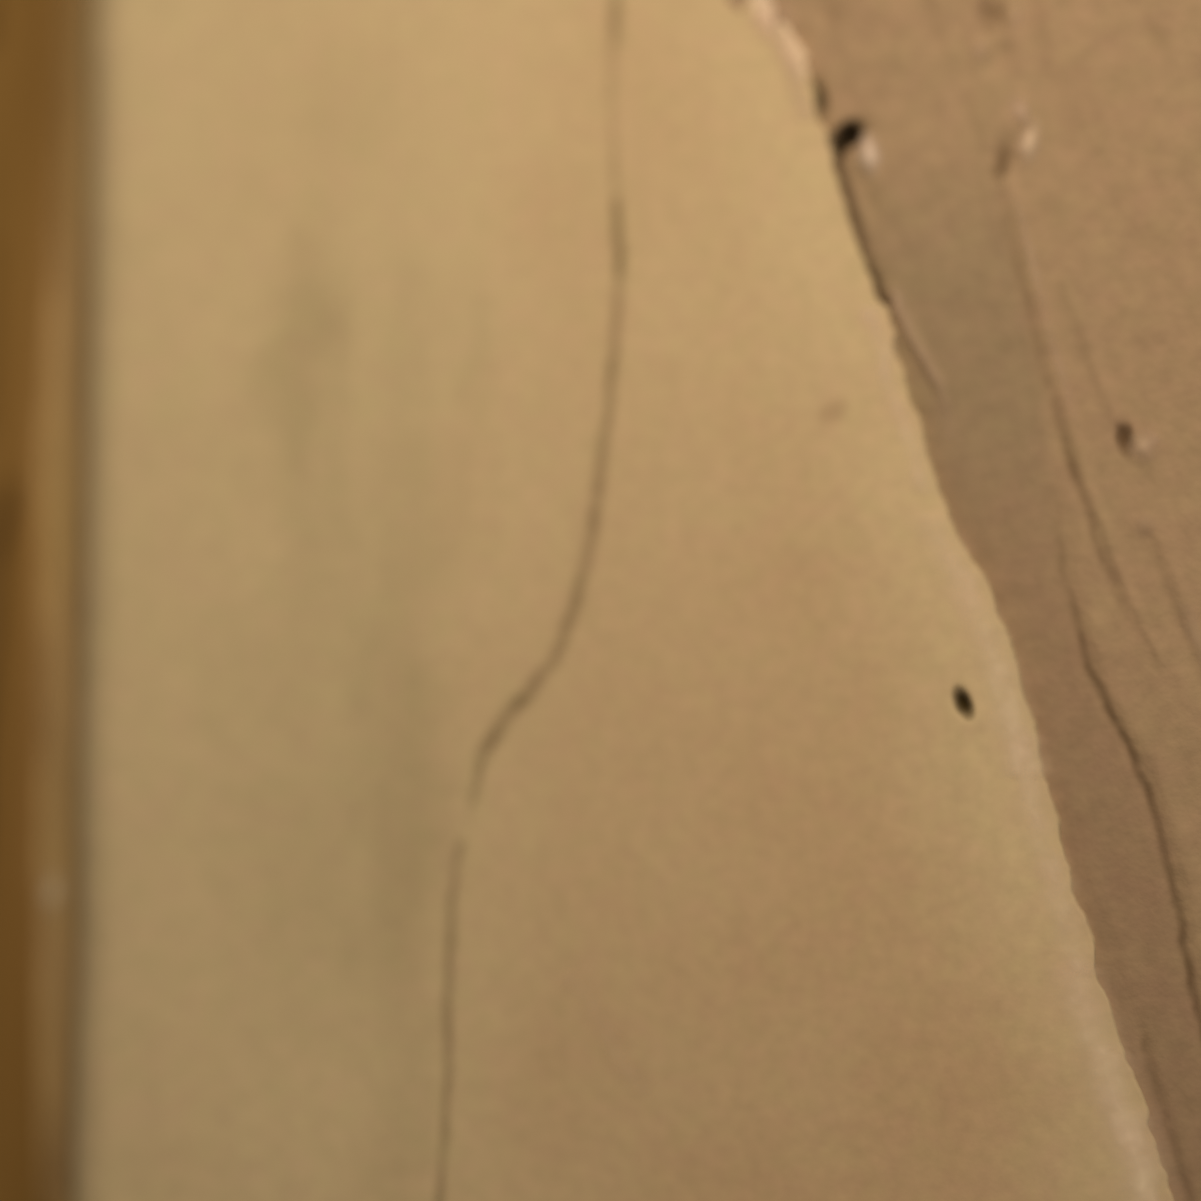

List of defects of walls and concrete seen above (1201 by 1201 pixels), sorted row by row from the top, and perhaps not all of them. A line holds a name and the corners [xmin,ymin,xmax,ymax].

spalling [728,0,1201,1201]